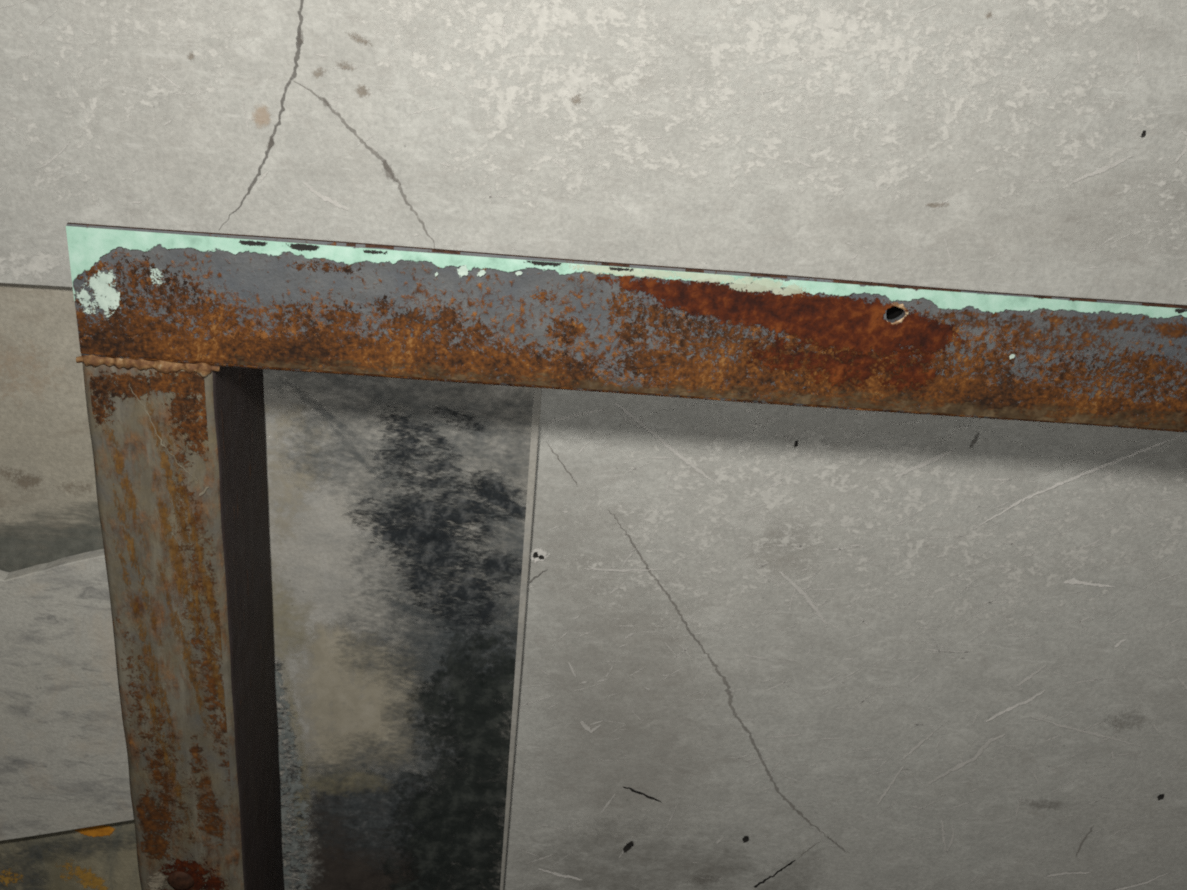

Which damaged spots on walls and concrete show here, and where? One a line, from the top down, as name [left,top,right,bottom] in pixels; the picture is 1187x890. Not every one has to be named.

crack [220,0,303,228]
peeling [66,226,1187,318]
damp [295,396,526,890]
rust [75,248,1187,890]